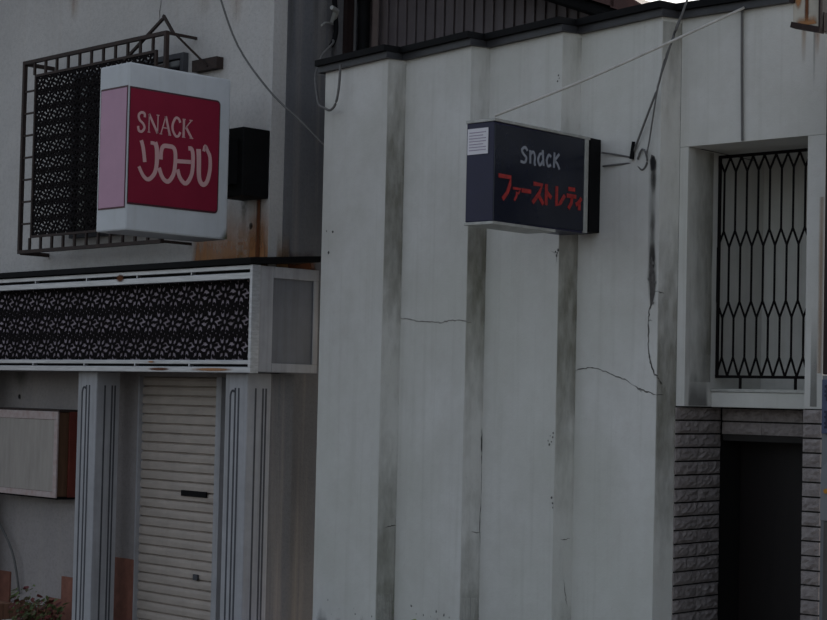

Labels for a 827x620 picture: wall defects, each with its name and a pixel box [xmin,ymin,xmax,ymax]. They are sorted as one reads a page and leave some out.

rust [796,0,816,25]
rust [195,199,315,270]
crack [400,316,471,324]
crack [578,291,663,395]